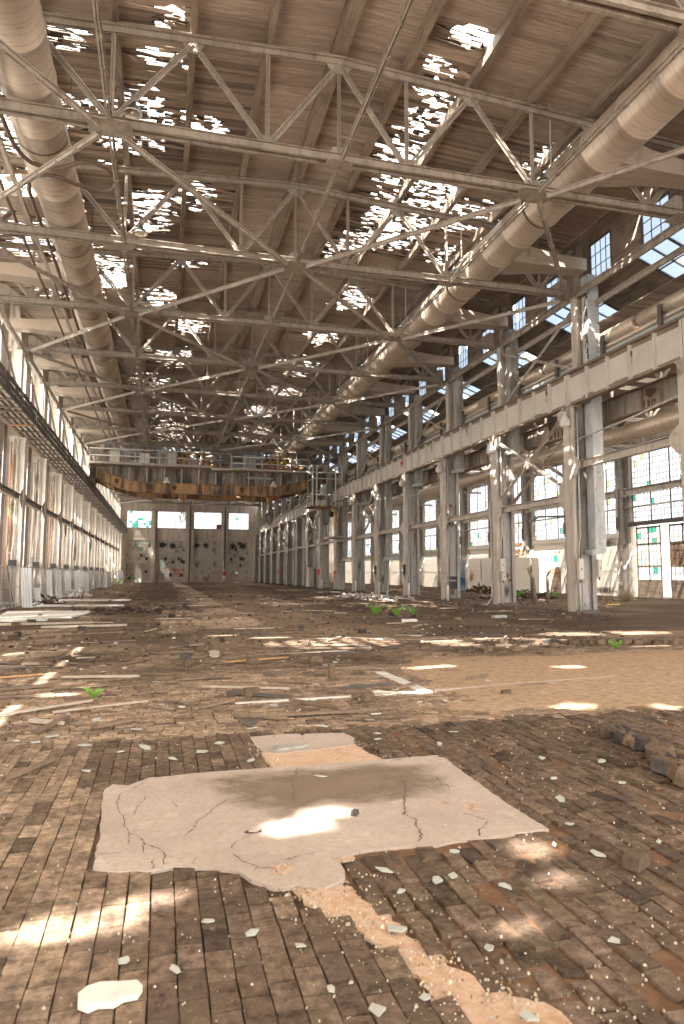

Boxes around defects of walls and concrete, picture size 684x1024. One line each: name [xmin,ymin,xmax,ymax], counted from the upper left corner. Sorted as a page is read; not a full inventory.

crack [100,781,226,870]
crack [401,779,423,841]